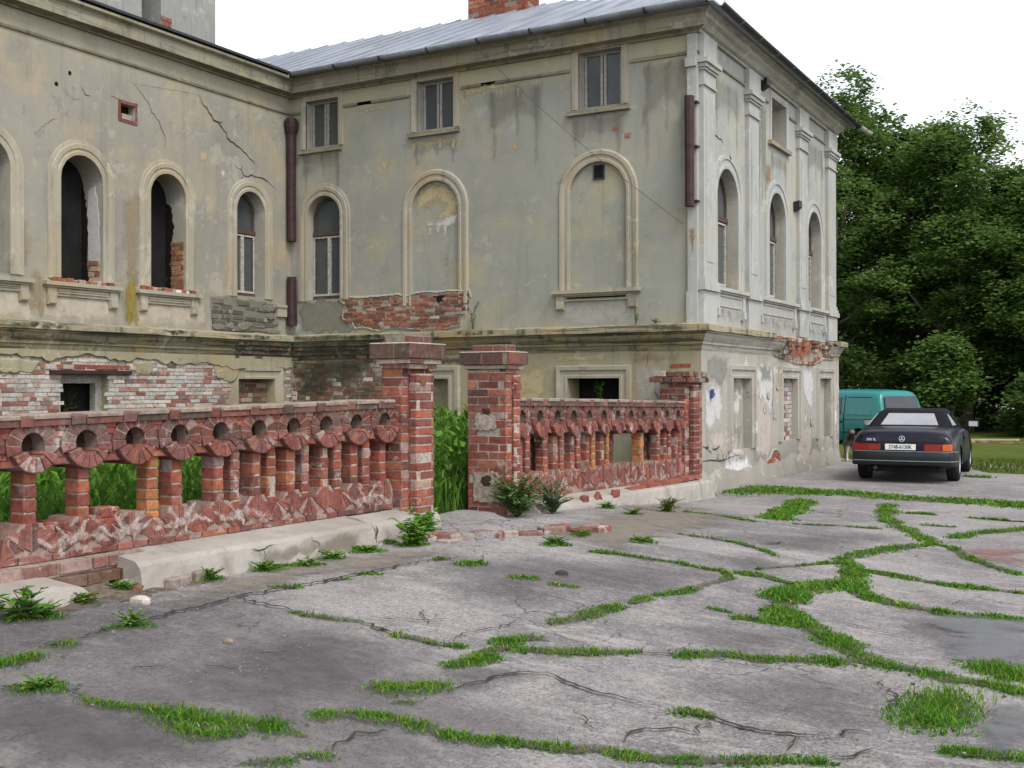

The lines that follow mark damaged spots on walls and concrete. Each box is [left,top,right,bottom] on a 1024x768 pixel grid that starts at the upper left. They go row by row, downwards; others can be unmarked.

crack [82,85,275,189]
leakage [125,195,138,325]
peeling [417,186,458,235]
flaking render [0,287,472,416]
flaking render [705,306,838,471]